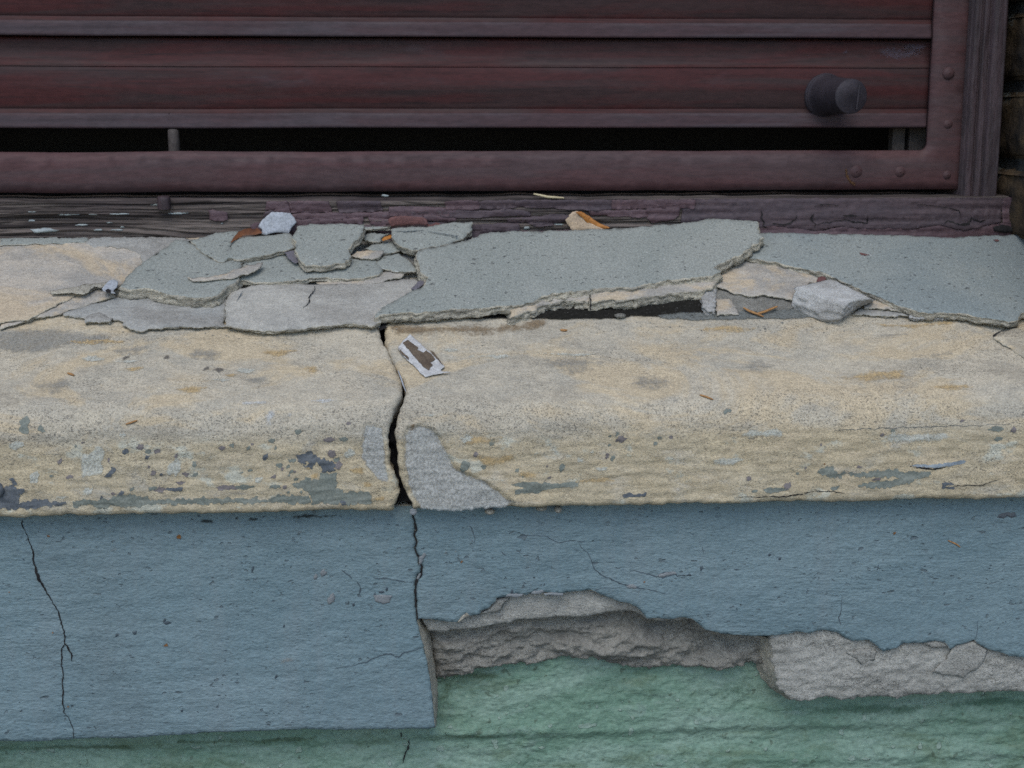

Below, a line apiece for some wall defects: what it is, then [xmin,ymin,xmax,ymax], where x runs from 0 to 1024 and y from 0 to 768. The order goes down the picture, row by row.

peeling [250,197,1013,261]
crack [379,323,388,345]
spalling [715,299,739,317]
spalling [853,309,947,321]
peeling [0,422,372,510]
spalling [362,426,388,481]
crack [342,396,426,620]
spalling [405,427,579,510]
peeling [605,432,627,461]
peeling [746,460,966,493]
crack [21,520,74,738]
flaking render [417,583,1024,727]